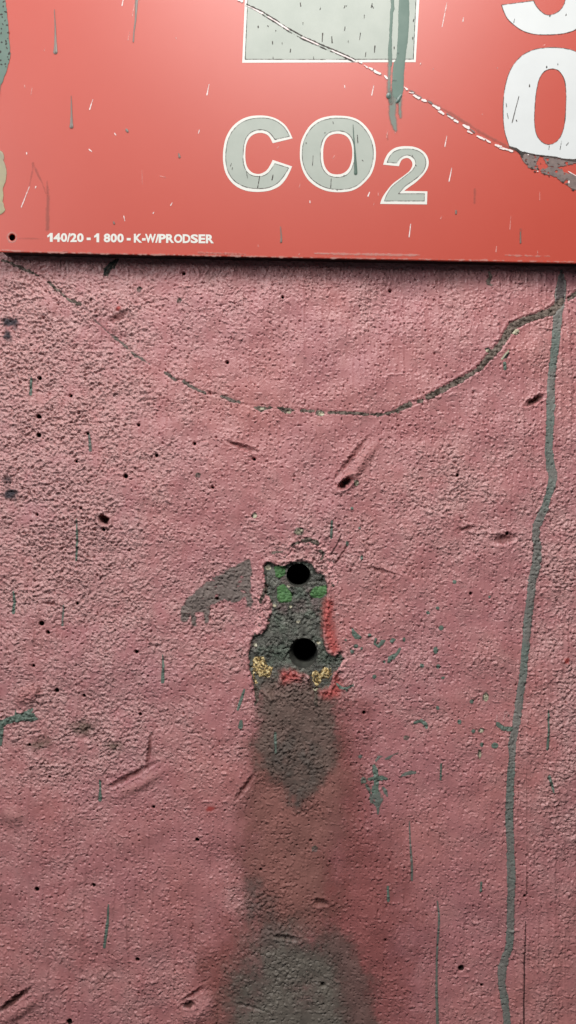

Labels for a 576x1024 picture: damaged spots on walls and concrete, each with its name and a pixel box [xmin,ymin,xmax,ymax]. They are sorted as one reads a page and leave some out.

crack [1,259,576,417]
spalling [248,527,349,707]
crack [520,921,528,1024]